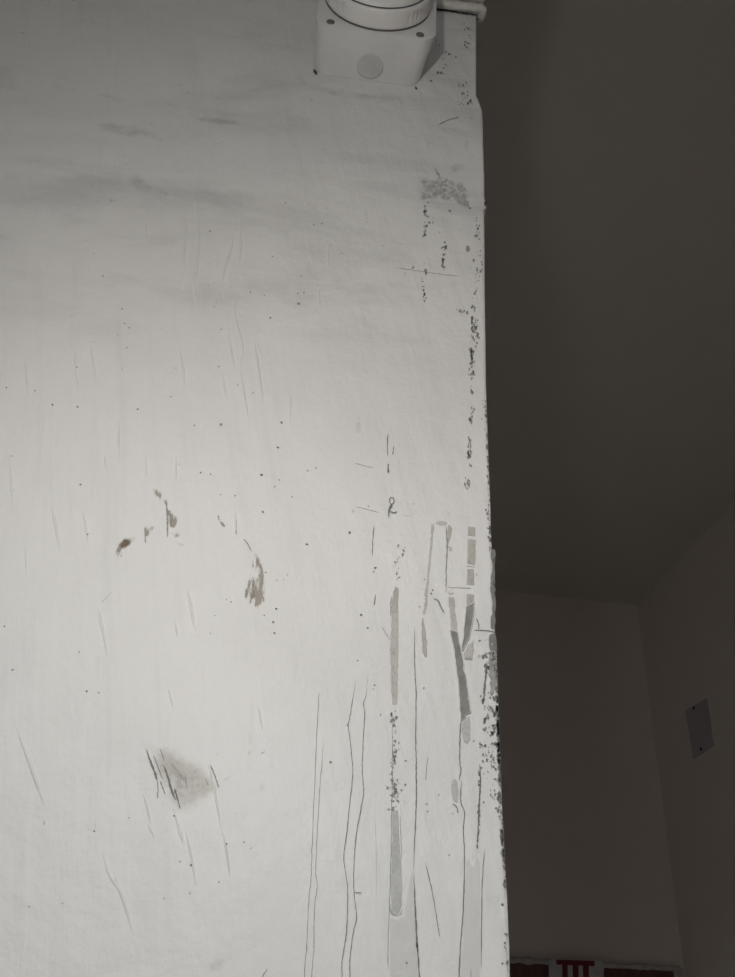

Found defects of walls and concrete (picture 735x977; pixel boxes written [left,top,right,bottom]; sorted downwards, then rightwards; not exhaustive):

peeling [419,200,506,888]
leakage [146,749,187,808]
crack [304,696,323,977]
crack [341,680,368,972]
peeling [380,544,407,916]
crack [388,630,420,977]